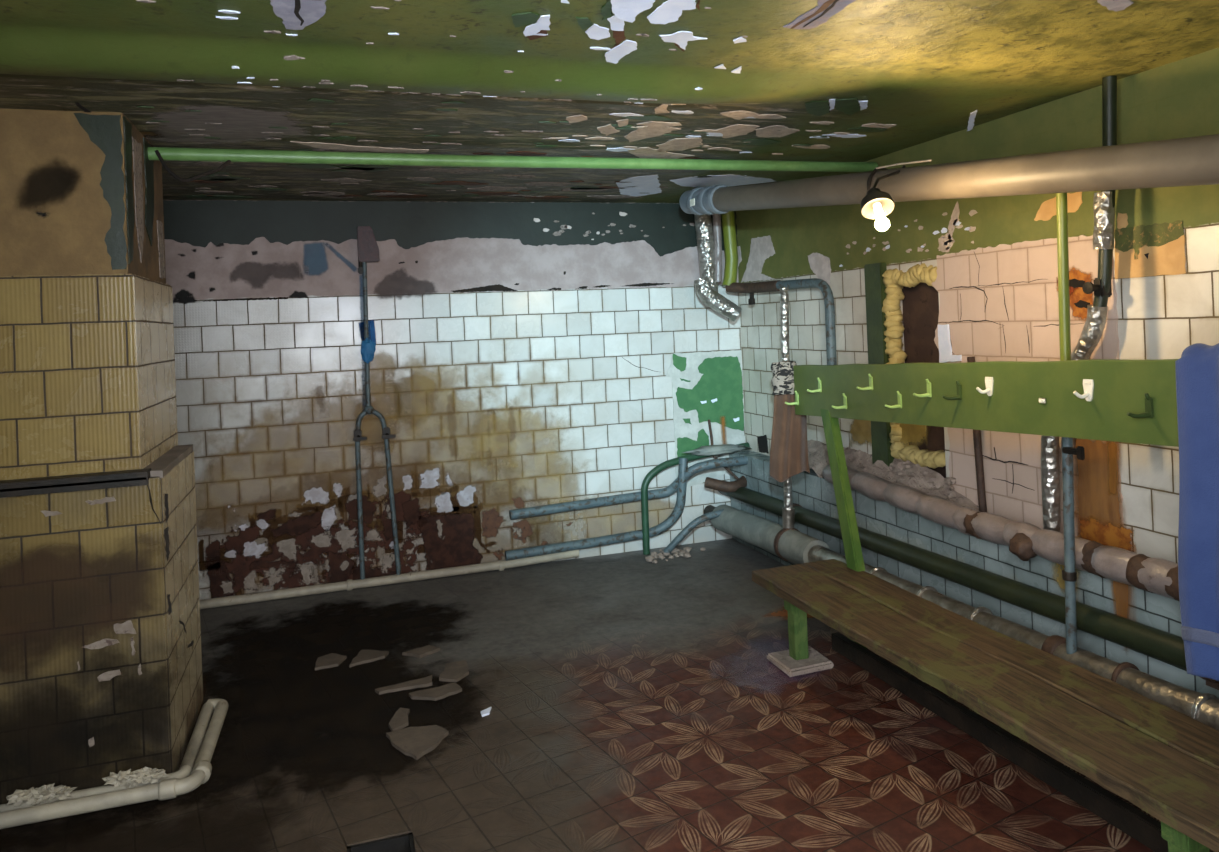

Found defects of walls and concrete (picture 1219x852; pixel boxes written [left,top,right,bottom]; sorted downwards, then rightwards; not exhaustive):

peeling [216,10,241,20]
peeling [512,12,550,52]
peeling [576,0,711,64]
peeling [301,80,497,111]
peeling [74,98,896,285]
peeling [898,201,978,253]
peeling [1034,192,1083,221]
peeling [1114,213,1186,279]
spalling [452,283,519,293]
spalling [205,467,548,598]
corrosion [1055,438,1152,619]